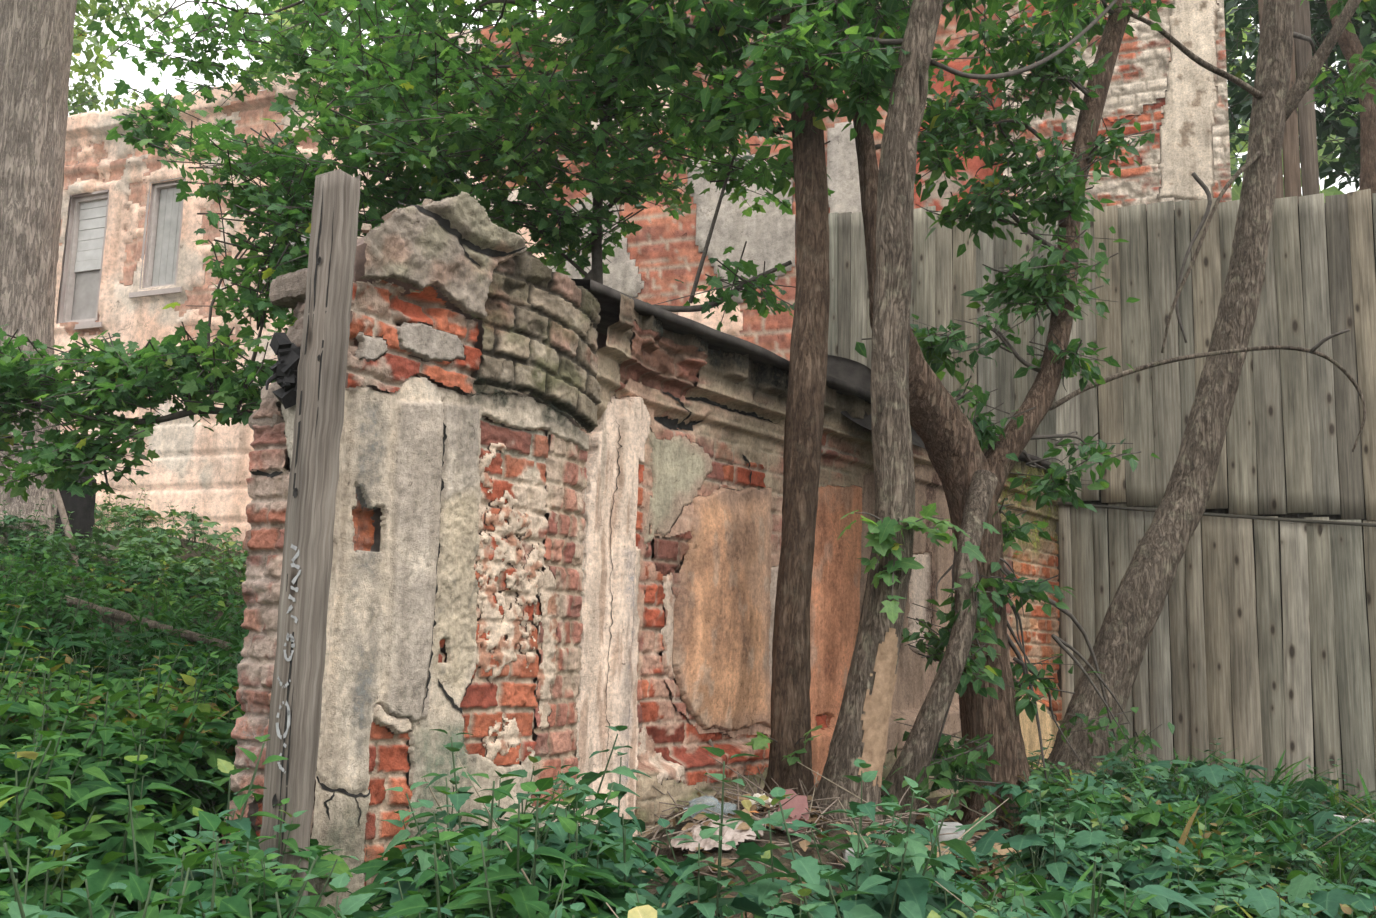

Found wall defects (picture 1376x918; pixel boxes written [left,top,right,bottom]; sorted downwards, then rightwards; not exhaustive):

crack [398,201,526,268]
spalling [346,280,482,394]
spalling [352,494,375,551]
crack [419,409,476,724]
flaking render [460,416,588,807]
flaking render [635,462,770,785]
crack [315,776,370,825]
flaking render [363,704,413,886]